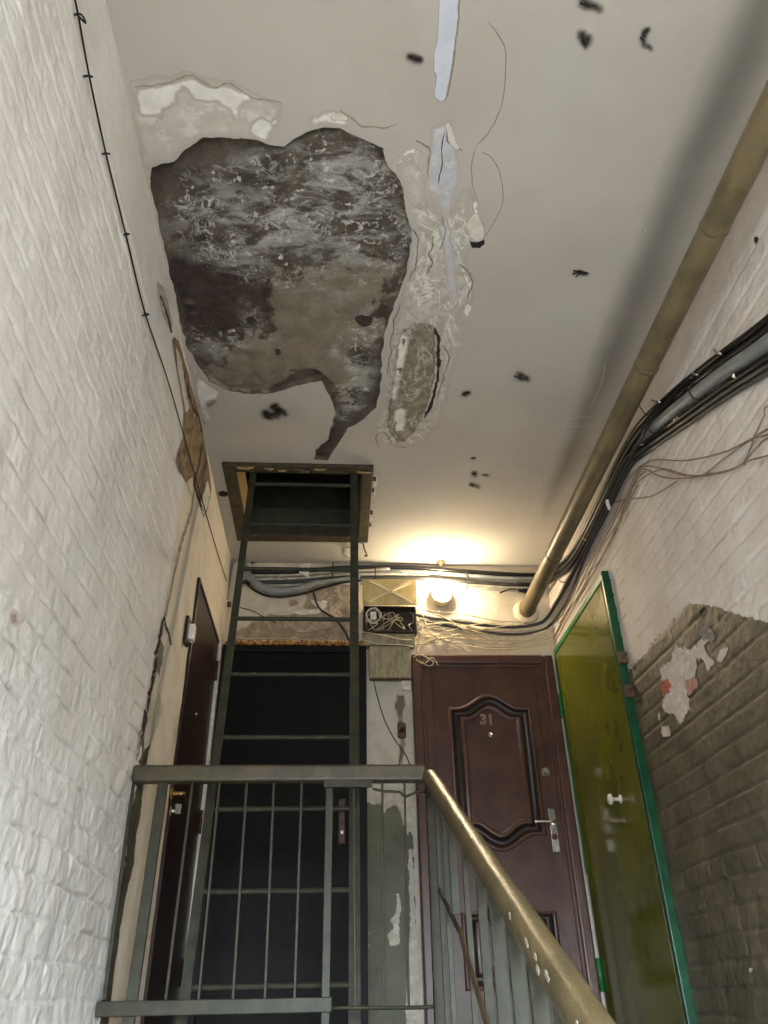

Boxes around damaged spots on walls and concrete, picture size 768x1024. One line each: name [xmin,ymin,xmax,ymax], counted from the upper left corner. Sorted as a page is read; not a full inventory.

peeling [434,0,460,102]
crack [471,22,507,236]
flaking render [130,71,485,517]
peeling [658,607,728,737]